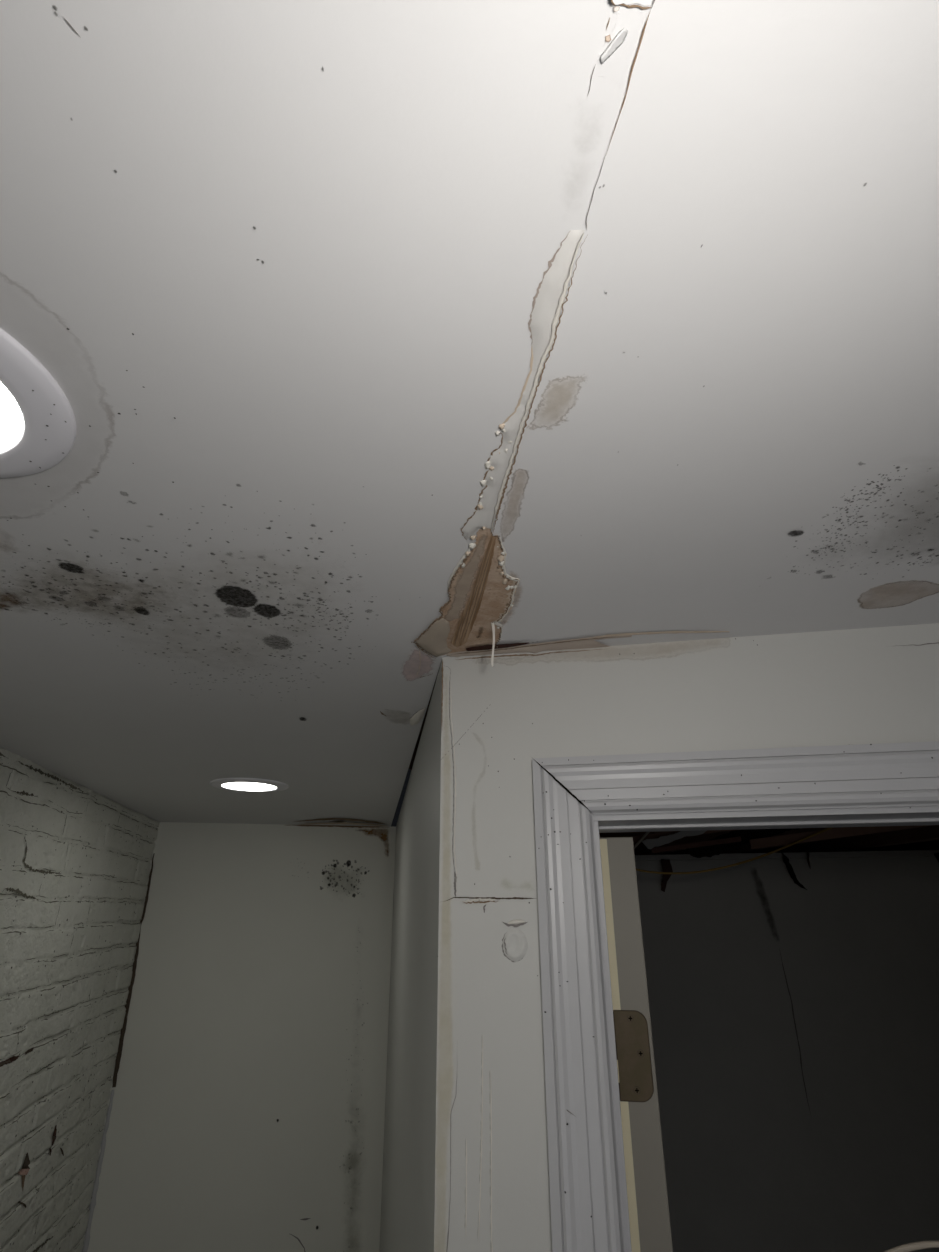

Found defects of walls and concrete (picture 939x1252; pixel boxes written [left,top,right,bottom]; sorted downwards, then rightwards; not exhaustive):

crack [490,0,655,532]
water stain [788,465,939,578]
water stain [5,538,368,690]
flaking render [411,527,520,658]
water stain [320,860,367,897]